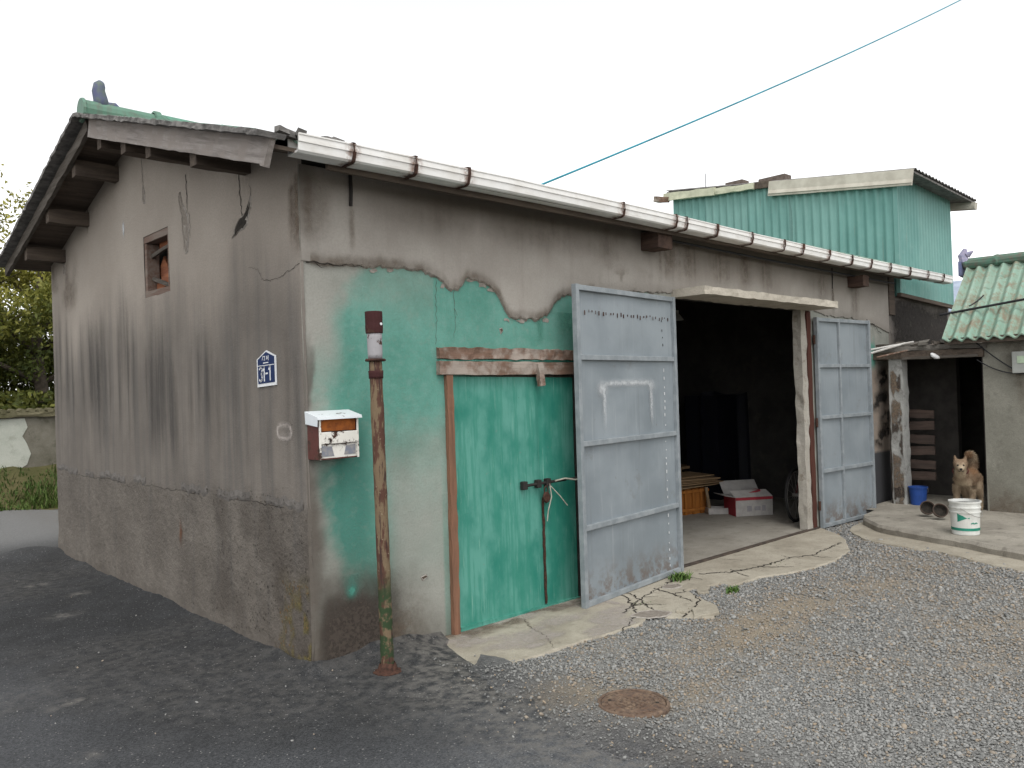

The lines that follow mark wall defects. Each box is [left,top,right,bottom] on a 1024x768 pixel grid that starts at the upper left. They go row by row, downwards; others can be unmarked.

crack [248,261,362,281]
flaking render [312,260,572,334]
peeling [890,371,905,504]
crack [622,542,841,631]
damp [324,591,380,660]